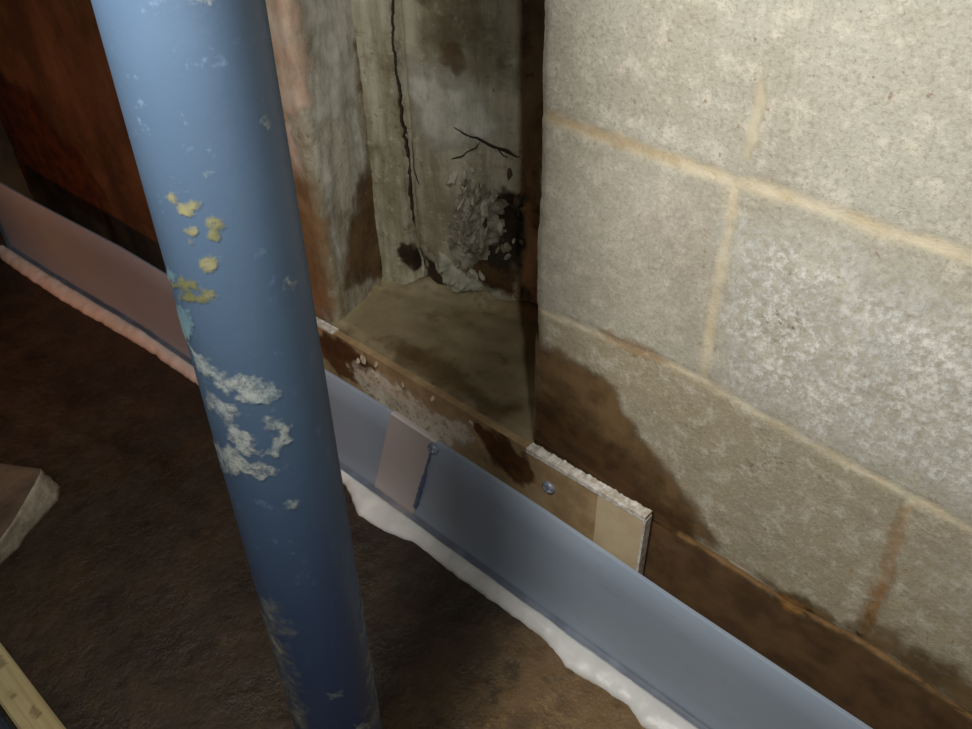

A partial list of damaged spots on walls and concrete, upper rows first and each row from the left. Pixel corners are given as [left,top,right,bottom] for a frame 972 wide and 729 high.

damp [304,0,382,289]
crack [391,0,419,237]
crack [452,127,519,159]
damp [464,264,514,292]
damp [473,423,534,485]
damp [533,340,972,729]
damp [720,219,972,508]